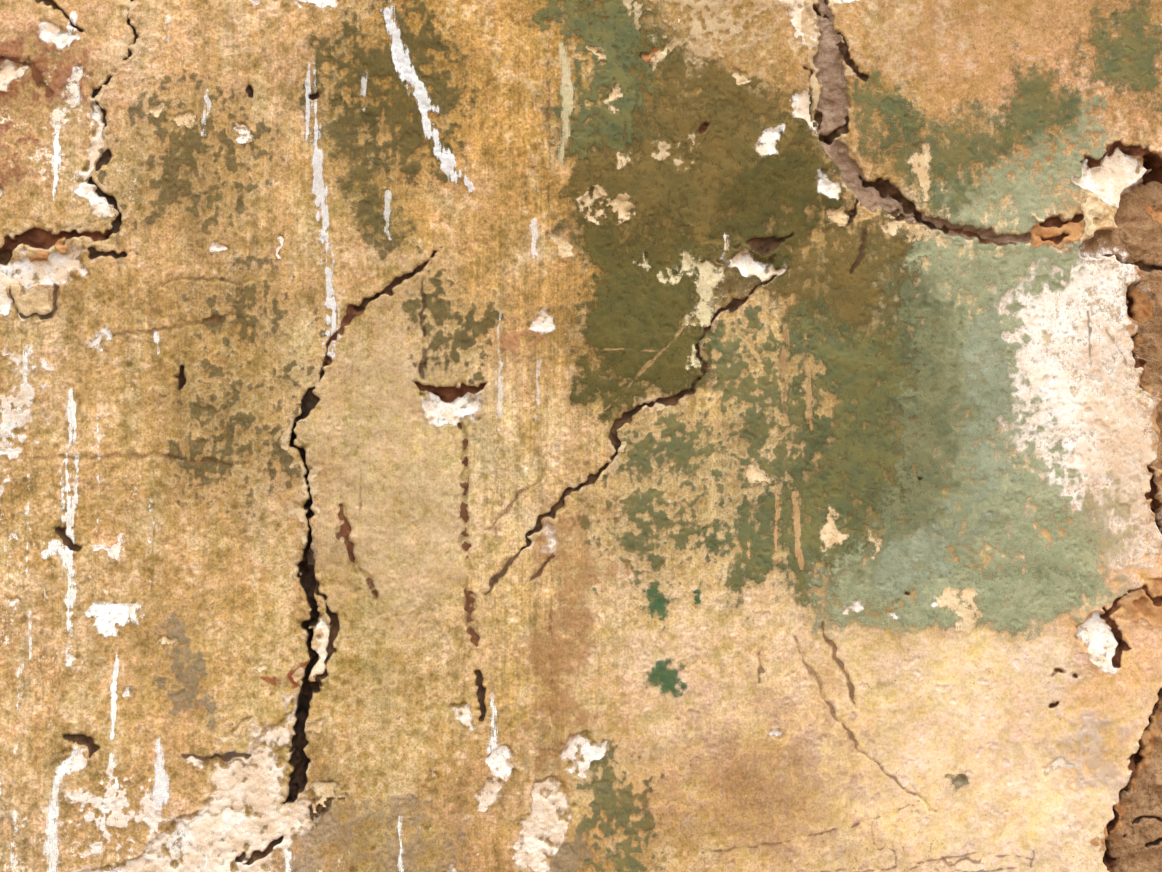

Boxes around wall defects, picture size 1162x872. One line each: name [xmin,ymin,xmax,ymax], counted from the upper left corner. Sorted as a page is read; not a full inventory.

flaking render [0,242,87,323]
crack [0,0,149,265]
water stain [305,64,340,359]
water stain [381,0,475,193]
peeling [528,0,1162,674]
crack [801,0,1033,274]
water stain [26,387,147,651]
crack [273,251,437,815]
crack [464,271,789,721]
water stain [43,652,171,872]
flaking render [72,694,346,872]
peeling [512,734,669,872]